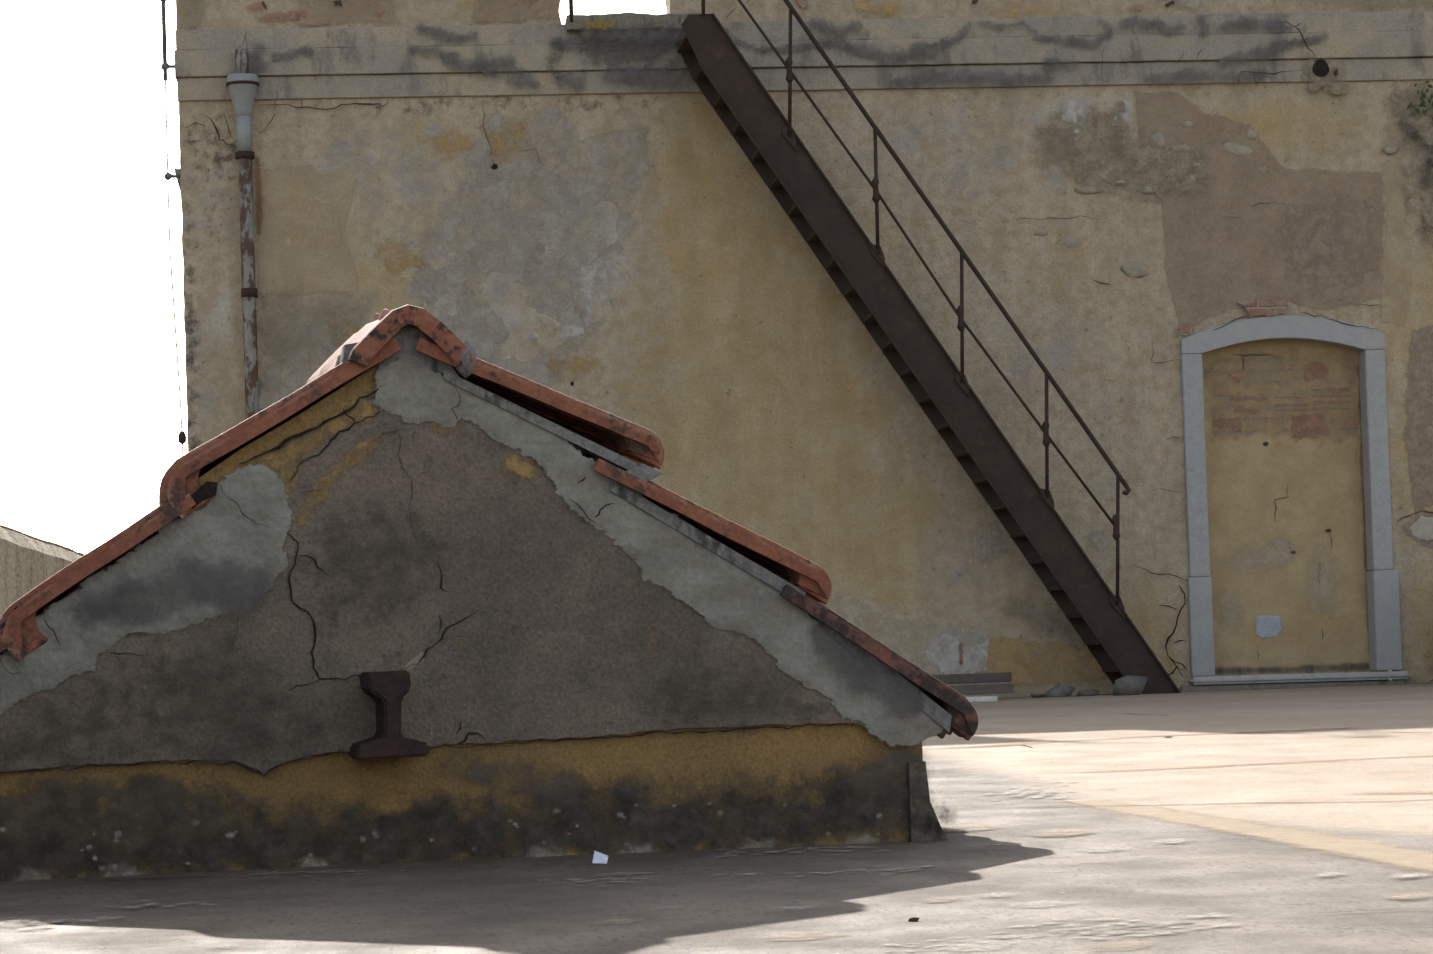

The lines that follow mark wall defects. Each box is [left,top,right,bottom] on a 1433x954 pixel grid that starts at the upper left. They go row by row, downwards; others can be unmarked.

water stain [410,25,539,88]
water stain [549,24,695,91]
water stain [725,16,1327,87]
spalling [1237,299,1290,317]
crack [219,386,478,691]
water stain [0,750,919,882]